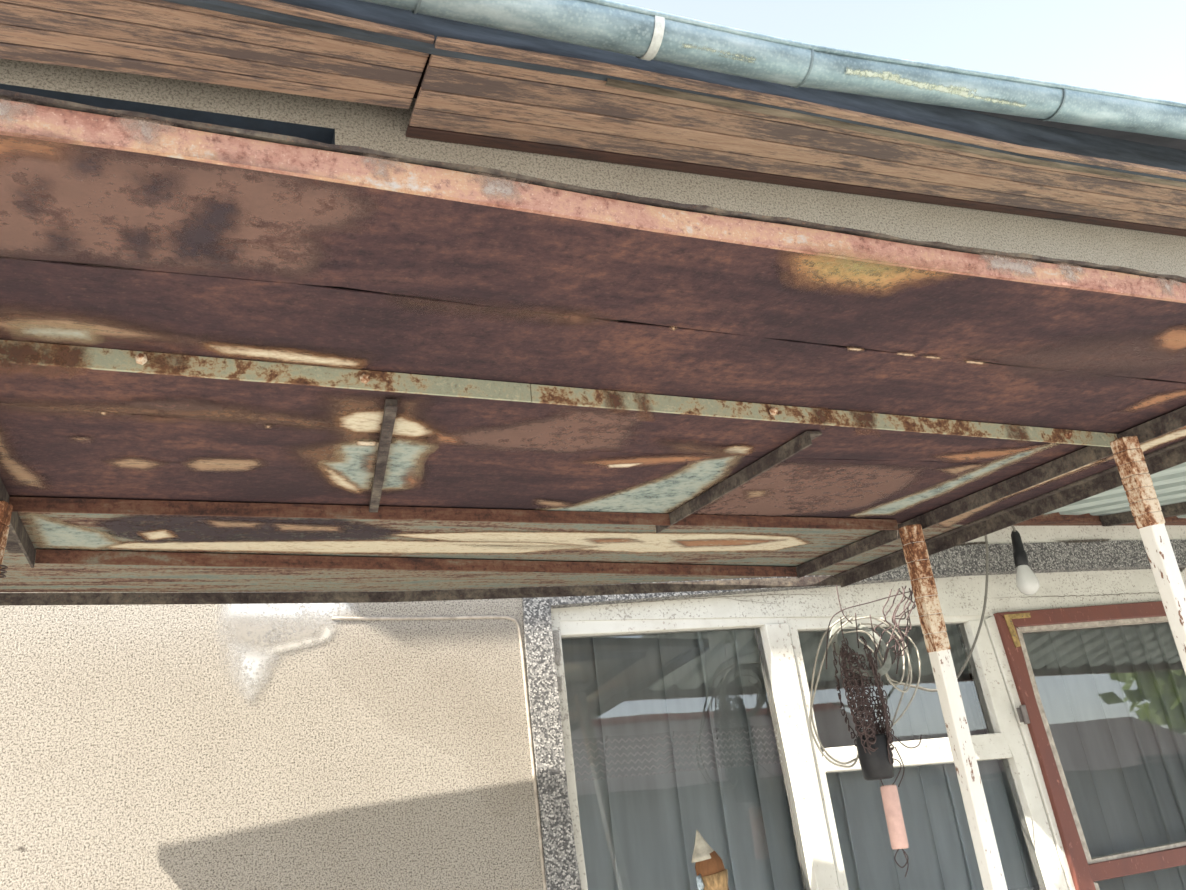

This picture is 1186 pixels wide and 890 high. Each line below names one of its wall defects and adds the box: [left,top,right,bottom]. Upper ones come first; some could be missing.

rust [0,136,374,275]
rust [789,251,956,292]
rust [0,341,84,375]
rust [0,400,339,430]
peeling [293,396,436,493]
rust [432,389,650,453]
peeling [535,444,752,514]
peeling [27,513,809,554]